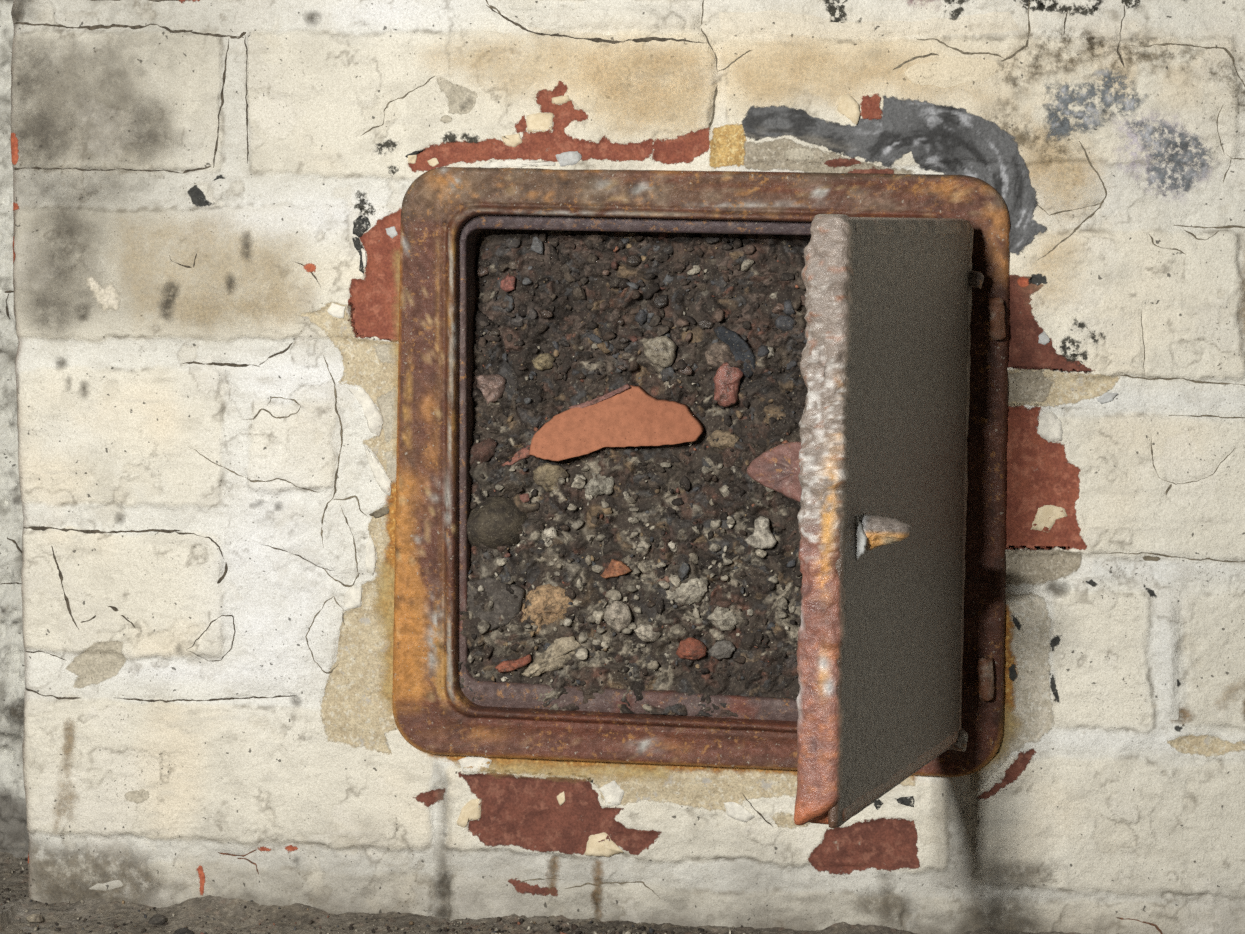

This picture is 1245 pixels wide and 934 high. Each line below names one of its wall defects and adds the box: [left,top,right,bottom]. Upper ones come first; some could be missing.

mould [825,0,861,23]
mould [944,0,966,20]
mould [1020,0,1103,15]
crack [486,0,751,129]
spalling [405,77,914,174]
crack [1,526,228,629]
crack [186,357,367,674]
rust [376,483,396,703]
spalling [970,273,1120,799]
rust [988,605,1018,764]
spalling [449,756,810,857]
spalling [808,776,920,875]